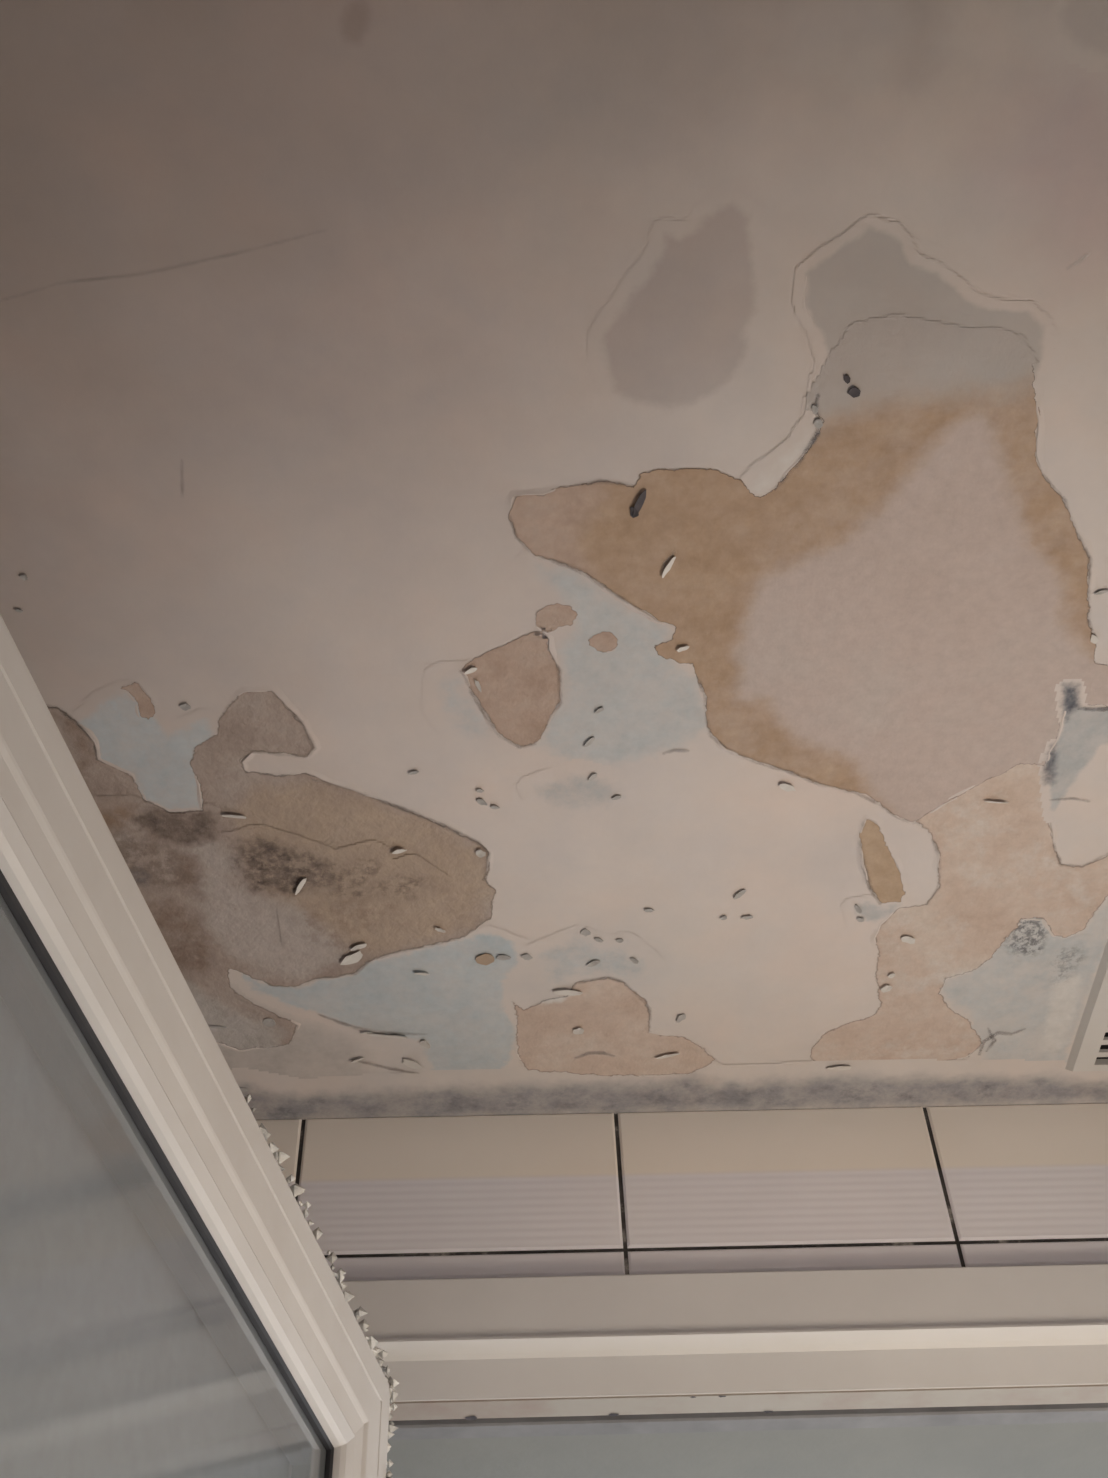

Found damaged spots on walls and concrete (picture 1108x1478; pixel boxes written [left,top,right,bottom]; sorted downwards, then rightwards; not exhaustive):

leakage [489,0,1108,429]
peeling [44,678,721,1077]
leakage [231,1059,1108,1120]
peeling [458,314,1108,1070]